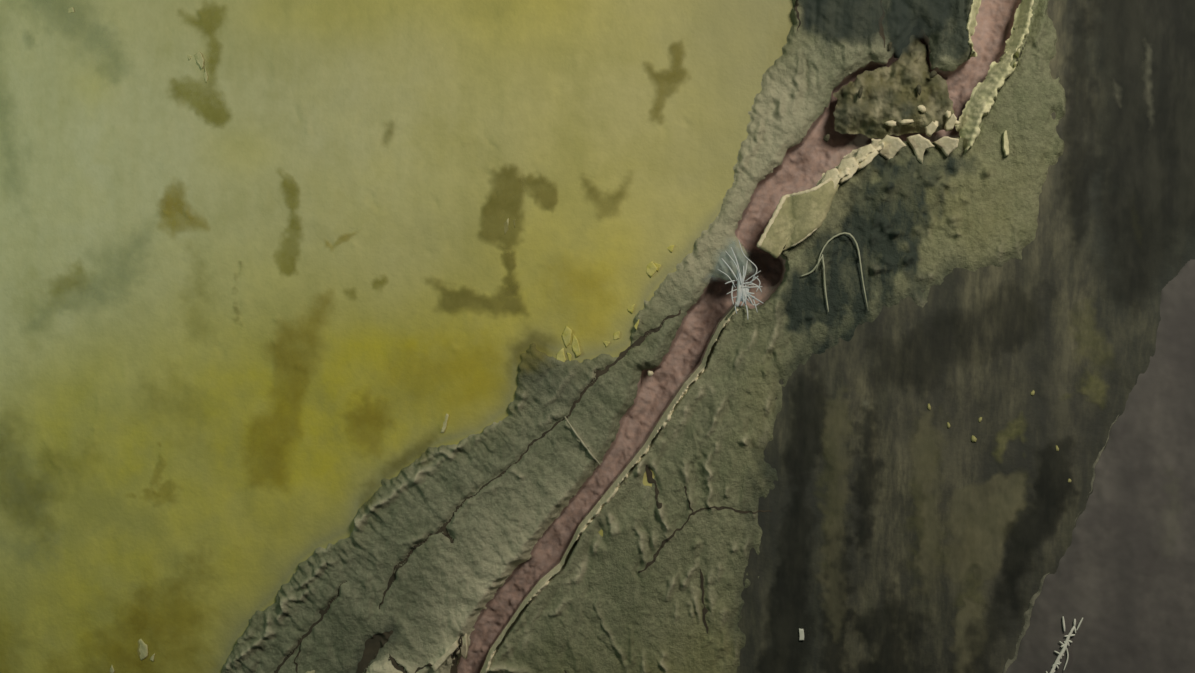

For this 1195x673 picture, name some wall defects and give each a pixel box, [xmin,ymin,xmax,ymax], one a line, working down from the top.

damp [192,8,221,73]
damp [175,84,228,125]
damp [649,44,685,117]
spalling [757,0,1034,259]
damp [283,180,300,231]
damp [441,168,557,313]
crack [356,0,1021,673]
spalling [480,306,739,673]
crack [274,581,347,673]
spalling [366,660,394,673]
flaking render [431,633,469,672]